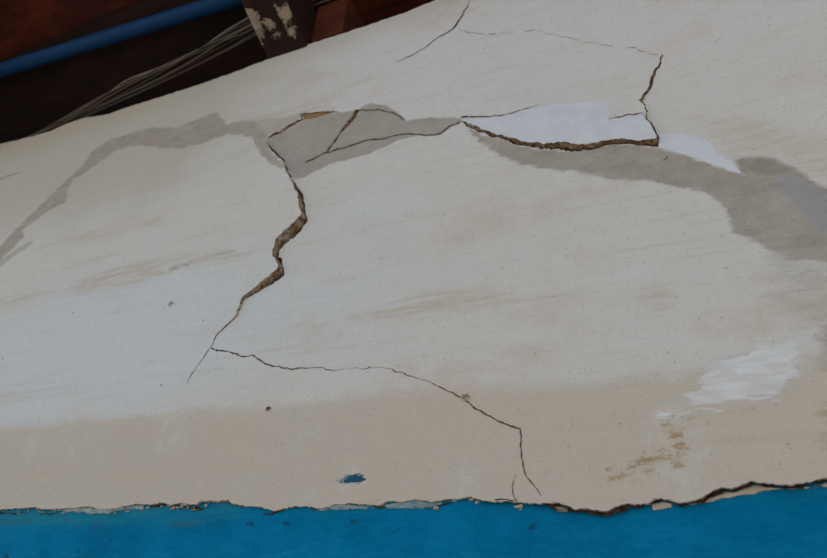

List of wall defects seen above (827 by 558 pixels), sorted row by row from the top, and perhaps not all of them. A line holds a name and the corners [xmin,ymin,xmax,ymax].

peeling [245,2,297,46]
crack [400,6,510,61]
peeling [0,55,827,273]
crack [187,105,827,516]
damp [709,203,827,325]
damp [782,375,827,478]
flaking render [190,493,238,505]